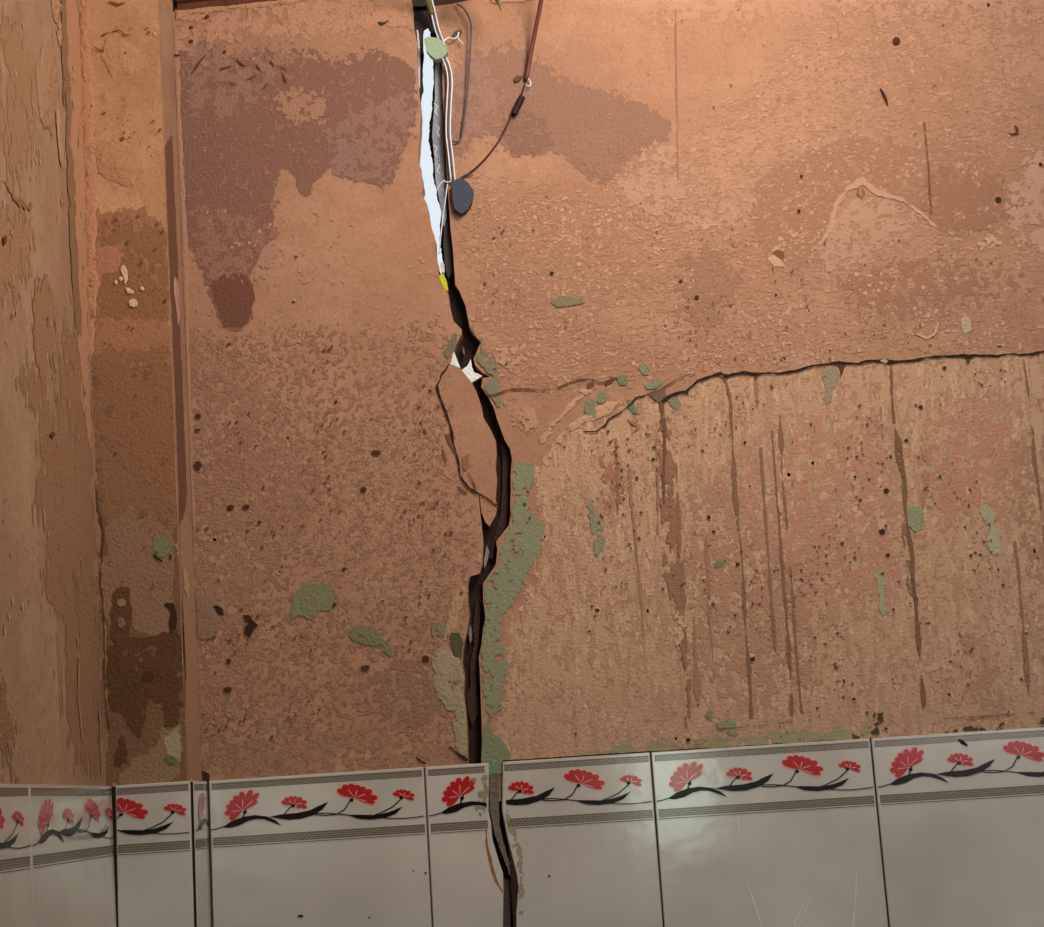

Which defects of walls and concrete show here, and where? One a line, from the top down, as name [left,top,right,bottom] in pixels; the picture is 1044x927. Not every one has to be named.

water stain [449,12,672,186]
crack [673,10,681,178]
crack [923,122,932,213]
water stain [460,190,653,365]
water stain [0,0,421,786]
peeling [470,326,539,435]
crack [415,6,618,764]
water stain [498,131,1044,758]
crack [583,351,1044,432]
peeling [290,350,1044,764]
crack [945,711,1035,719]
crack [486,801,514,927]